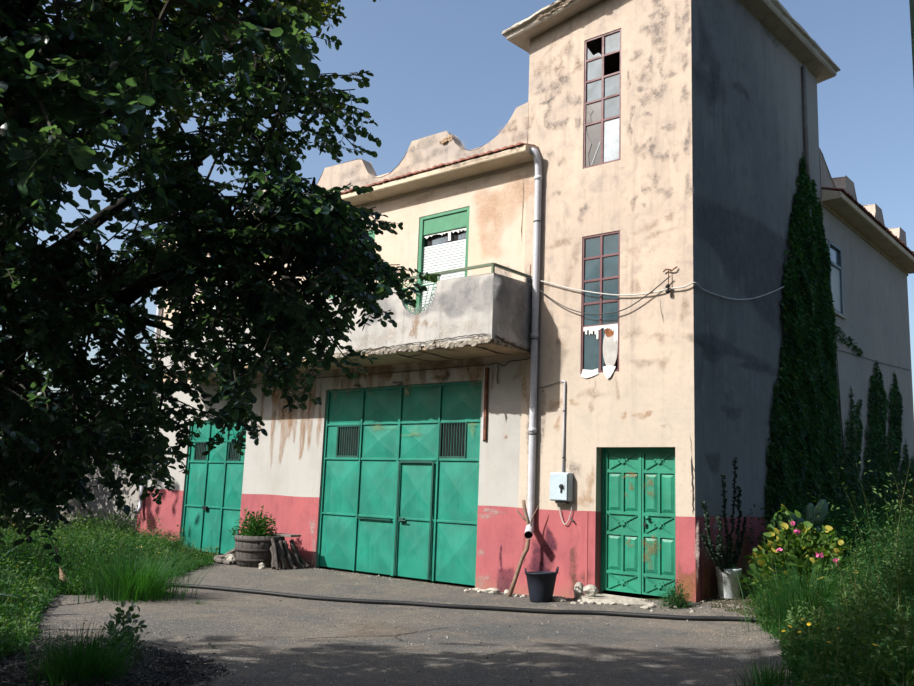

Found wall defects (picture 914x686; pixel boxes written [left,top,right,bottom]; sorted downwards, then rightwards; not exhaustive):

spalling [315,326,530,358]
water stain [531,530,556,571]